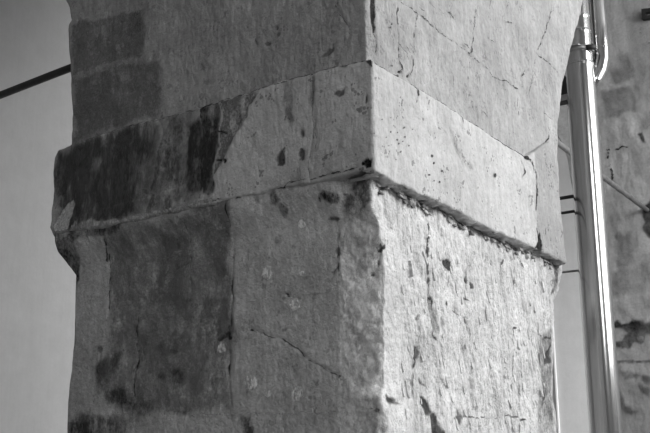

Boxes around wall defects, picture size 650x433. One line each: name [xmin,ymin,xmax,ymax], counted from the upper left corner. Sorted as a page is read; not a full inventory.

damp [54,122,169,282]
damp [174,103,220,196]
crack [157,0,538,209]
crack [250,329,341,377]